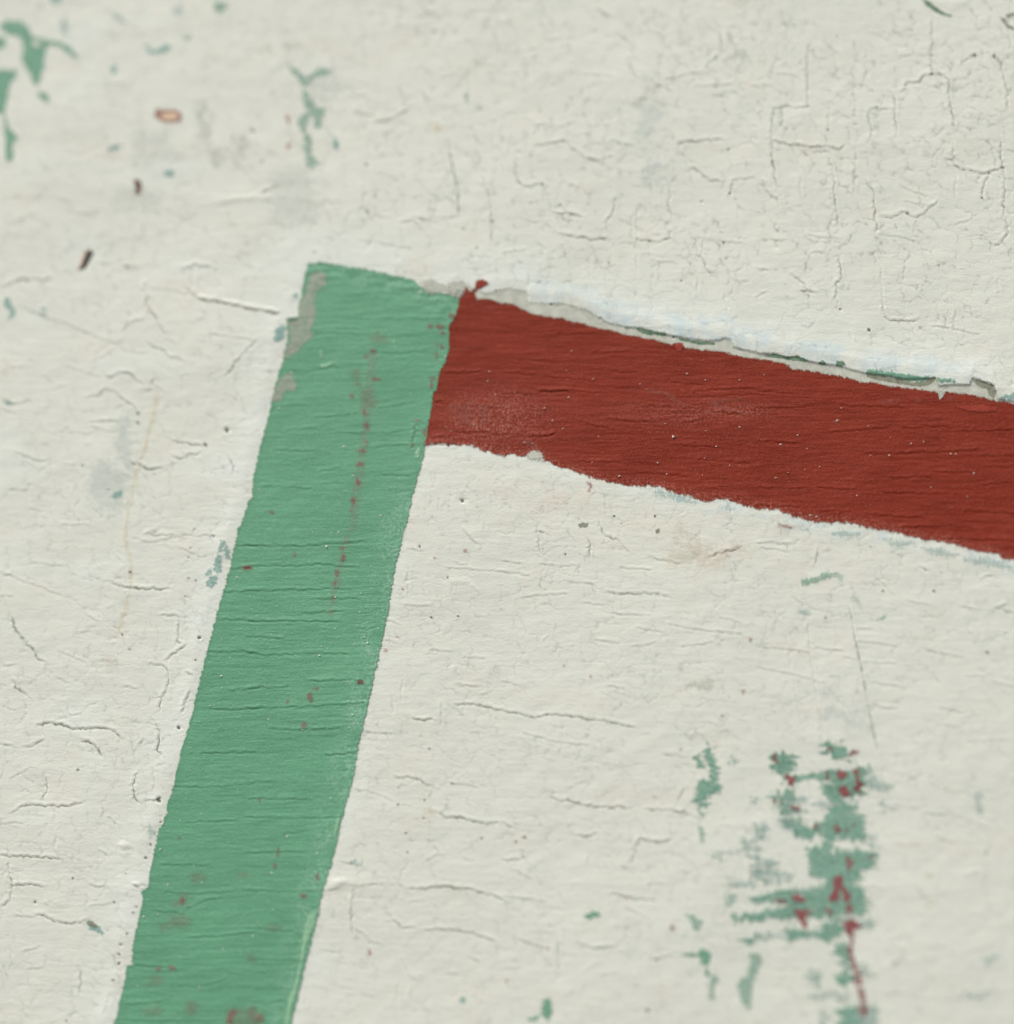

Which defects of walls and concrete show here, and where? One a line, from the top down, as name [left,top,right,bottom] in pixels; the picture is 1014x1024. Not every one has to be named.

peeling [0,19,78,162]
peeling [287,65,332,170]
peeling [273,273,326,357]
peeling [765,354,845,366]
peeling [867,369,955,399]
peeling [691,742,722,815]
peeling [682,948,717,998]
peeling [737,953,762,1009]